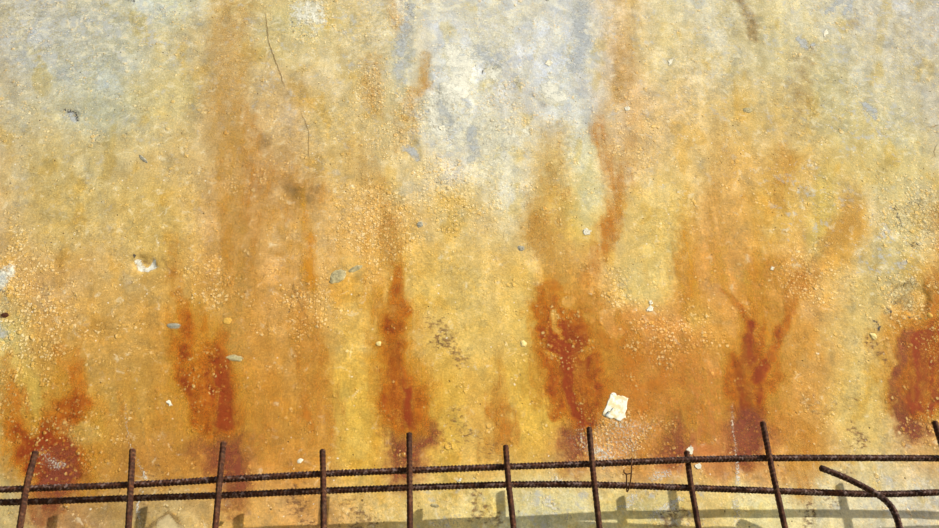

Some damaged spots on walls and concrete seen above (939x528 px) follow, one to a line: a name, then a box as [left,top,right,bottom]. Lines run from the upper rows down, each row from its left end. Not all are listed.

corrosion [0,363,101,521]
corrosion [169,302,251,508]
corrosion [370,268,439,483]
corrosion [528,207,708,468]
corrosion [712,263,814,469]
corrosion [886,274,939,441]